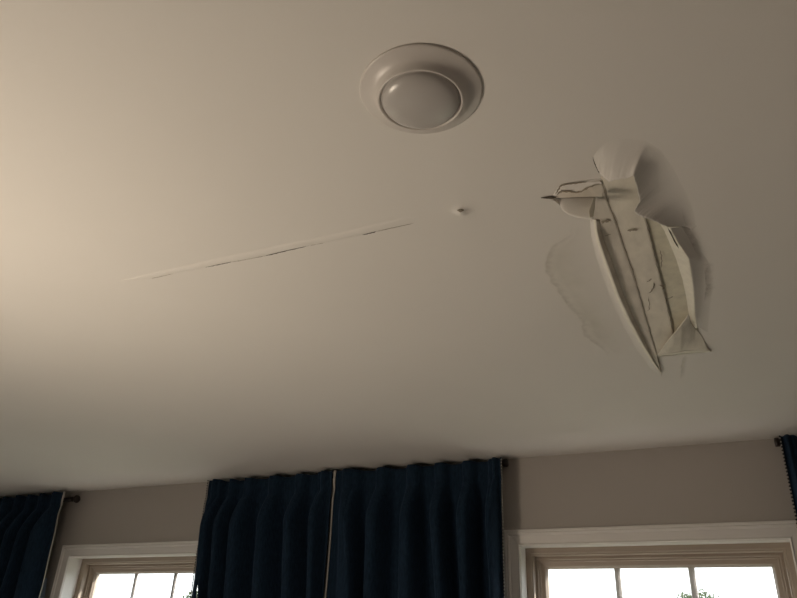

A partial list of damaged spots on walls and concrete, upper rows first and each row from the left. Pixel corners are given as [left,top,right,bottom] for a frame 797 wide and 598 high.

peeling [541,138,713,376]